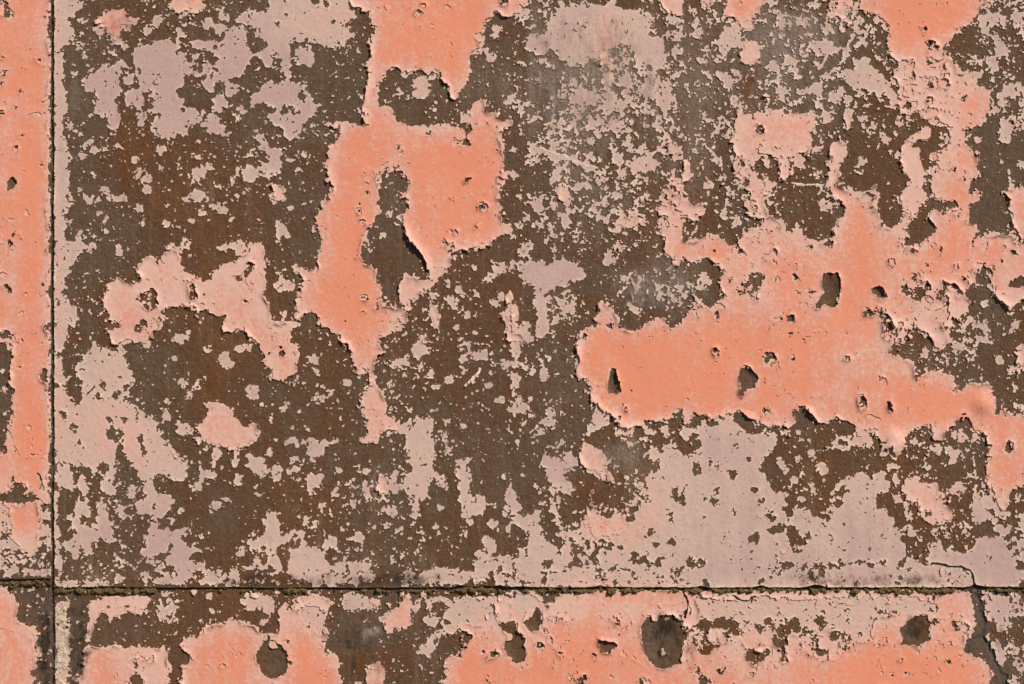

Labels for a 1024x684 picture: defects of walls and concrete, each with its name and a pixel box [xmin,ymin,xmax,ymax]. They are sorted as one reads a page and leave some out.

spalling [7,170,26,191]
peeling [135,288,159,315]
peeling [232,257,256,304]
spalling [733,259,841,331]
peeling [0,330,28,456]
spalling [607,368,622,395]
spalling [737,365,793,400]
peeling [758,349,780,370]
peeling [860,259,1024,417]
spalling [592,613,636,665]
crack [928,561,1009,684]
peeling [688,664,726,684]